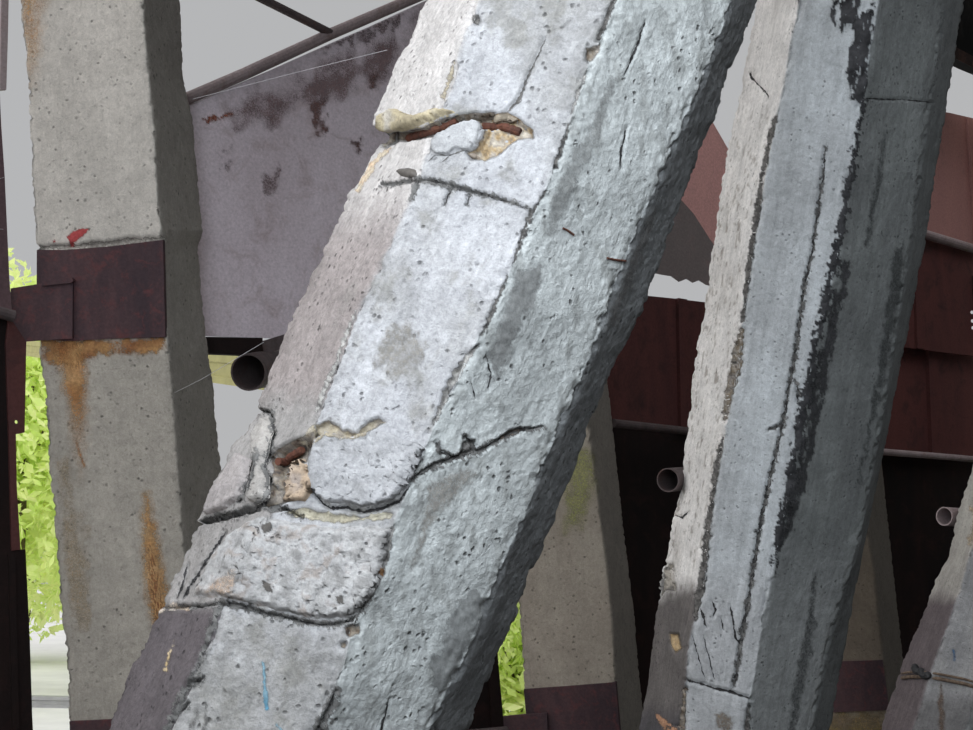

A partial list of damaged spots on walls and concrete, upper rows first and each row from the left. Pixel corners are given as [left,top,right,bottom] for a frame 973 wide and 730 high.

water stain [830,0,875,33]
spalling [375,61,533,161]
crack [378,150,531,211]
rust [41,337,165,429]
spalling [203,309,425,575]
crack [684,146,828,699]
water stain [781,260,851,543]
water stain [861,248,902,464]
rust [142,495,168,622]
crack [163,407,547,730]
water stain [790,576,816,730]